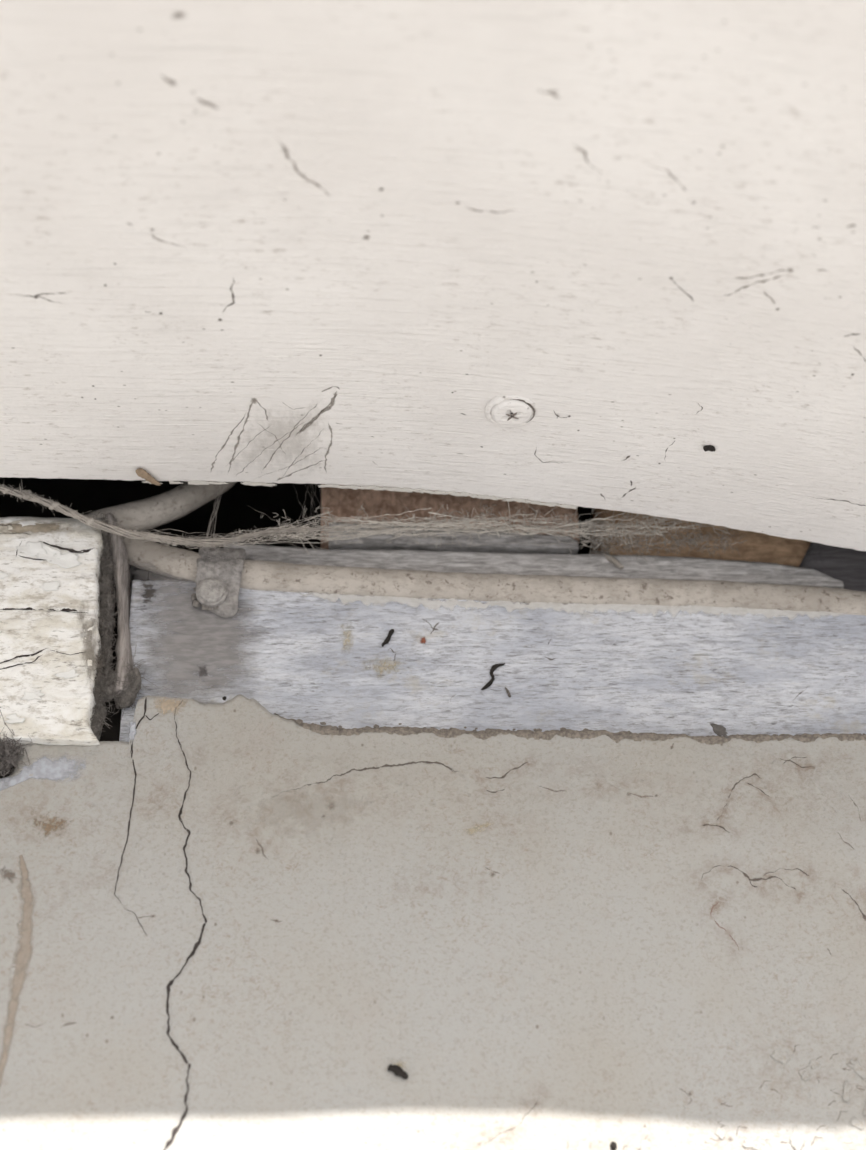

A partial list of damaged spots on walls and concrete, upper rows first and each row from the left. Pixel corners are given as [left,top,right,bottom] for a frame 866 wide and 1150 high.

crack [1,606,87,614]
crack [0,648,84,670]
crack [293,761,459,790]
crack [486,762,527,793]
crack [114,698,207,1150]
crack [706,1045,864,1145]